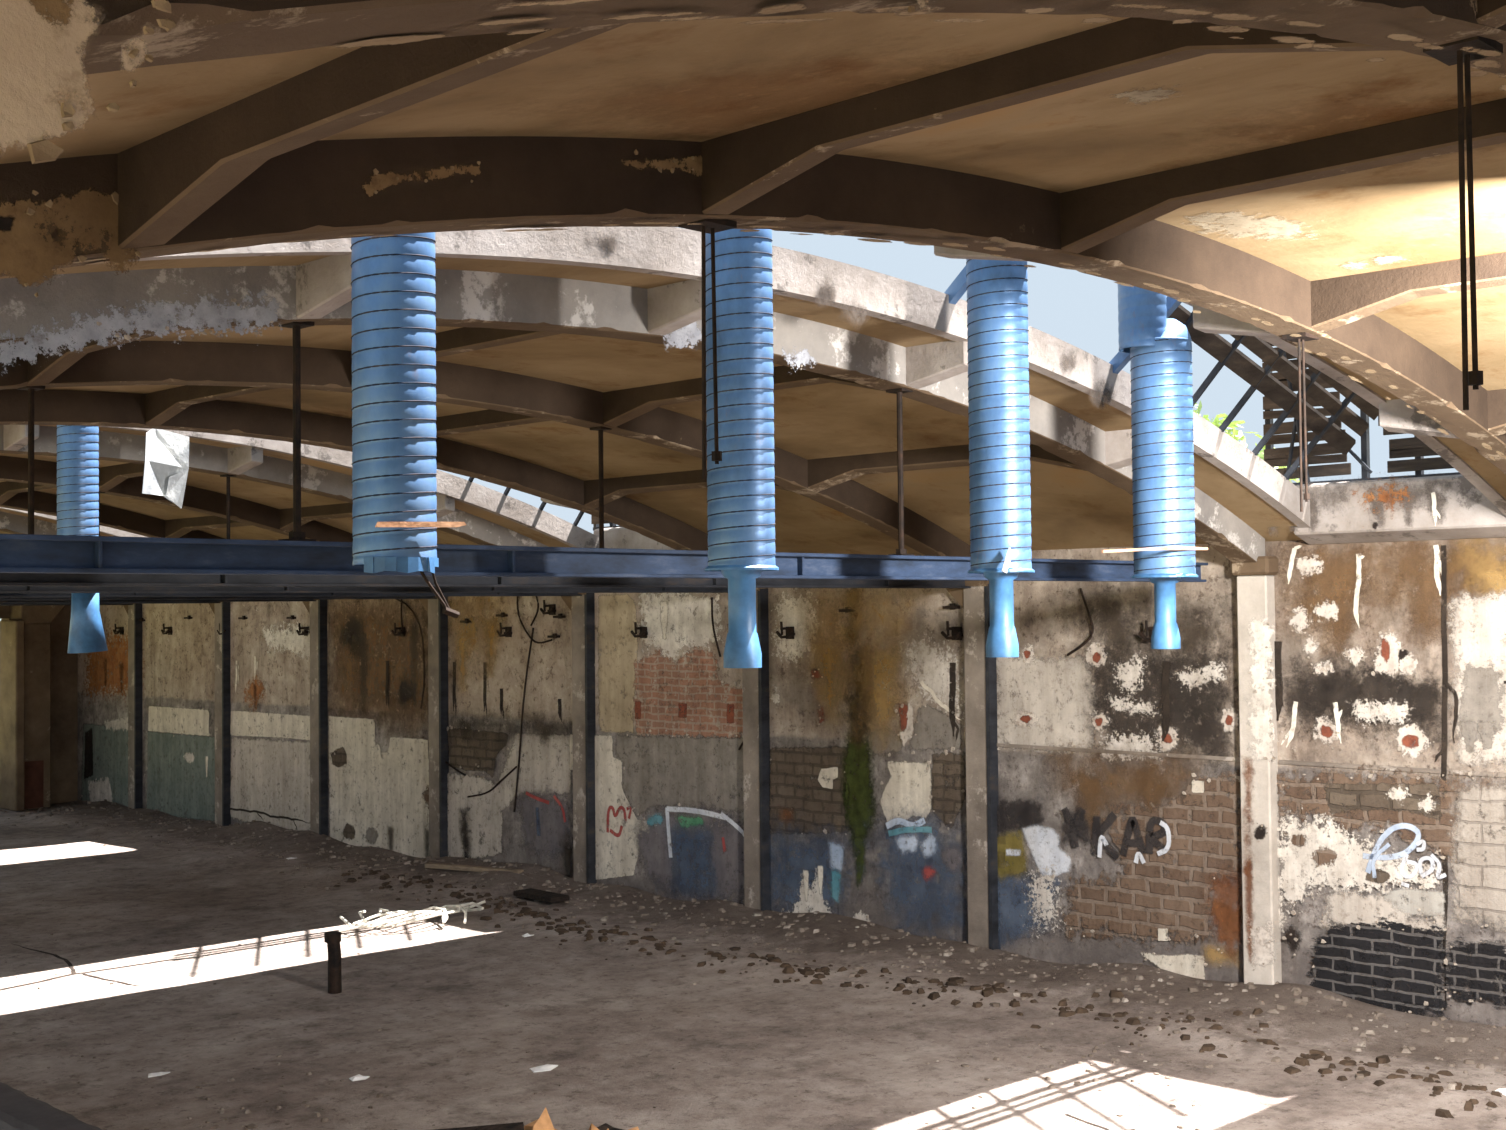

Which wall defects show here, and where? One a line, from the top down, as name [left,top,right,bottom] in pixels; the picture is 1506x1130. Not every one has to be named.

flaking render [0,0,120,164]
spalling [333,34,445,48]
peeling [0,187,141,297]
peeling [0,284,283,376]
flaking render [1294,554,1324,579]
rust [81,625,145,712]
peeling [260,621,310,662]
water stain [815,588,908,744]
peeling [147,706,310,831]
peeling [328,716,429,858]
peeling [447,725,573,859]
spalling [996,590,1506,1018]